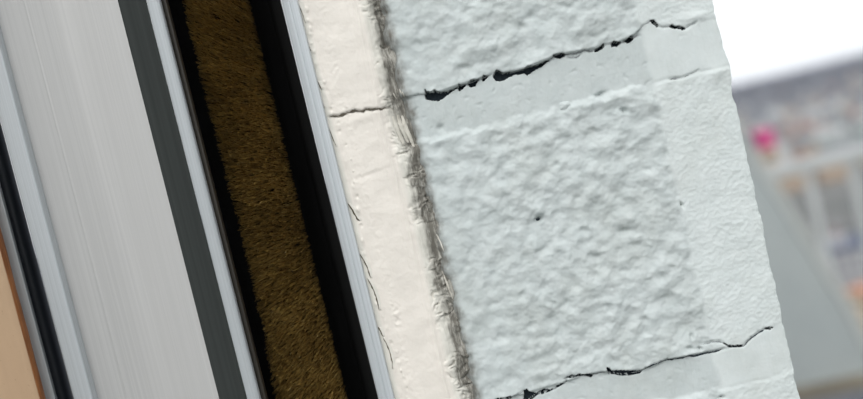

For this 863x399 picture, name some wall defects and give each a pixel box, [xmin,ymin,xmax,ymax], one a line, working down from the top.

crack [414,20,696,101]
crack [330,107,386,117]
crack [497,327,773,399]